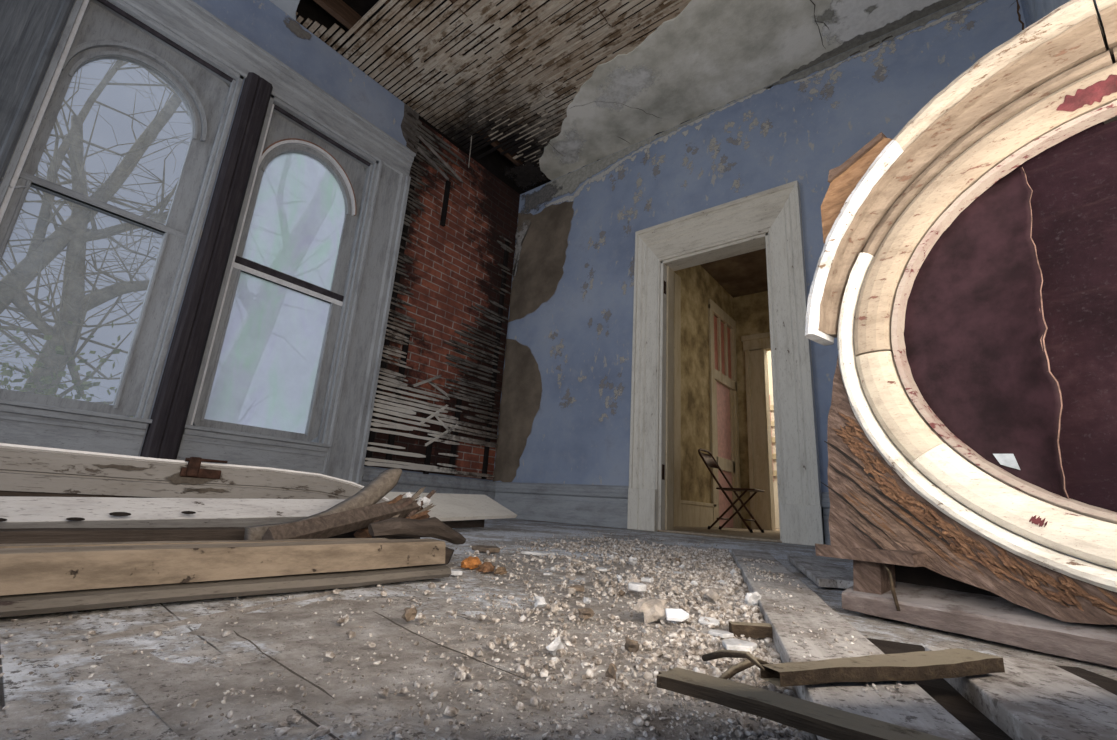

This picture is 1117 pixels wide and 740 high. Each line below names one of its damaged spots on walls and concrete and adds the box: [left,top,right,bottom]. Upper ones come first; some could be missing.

flaking render [296,0,986,482]
crack [810,0,829,48]